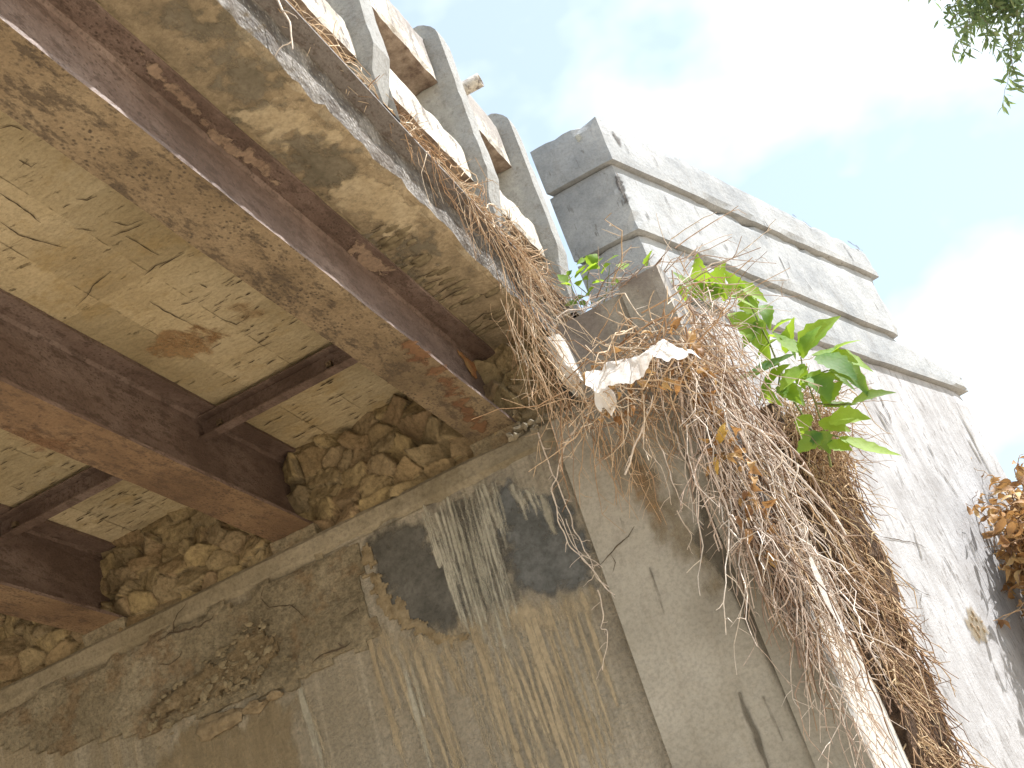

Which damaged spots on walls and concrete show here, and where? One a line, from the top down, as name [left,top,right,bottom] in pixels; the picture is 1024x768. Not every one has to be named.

leakage [160,0,294,123]
peeling [140,53,346,185]
leakage [270,131,363,197]
crack [157,604,214,665]
spalling [133,618,297,738]
crack [313,643,350,662]
peeling [361,542,470,648]
leakage [367,480,619,768]